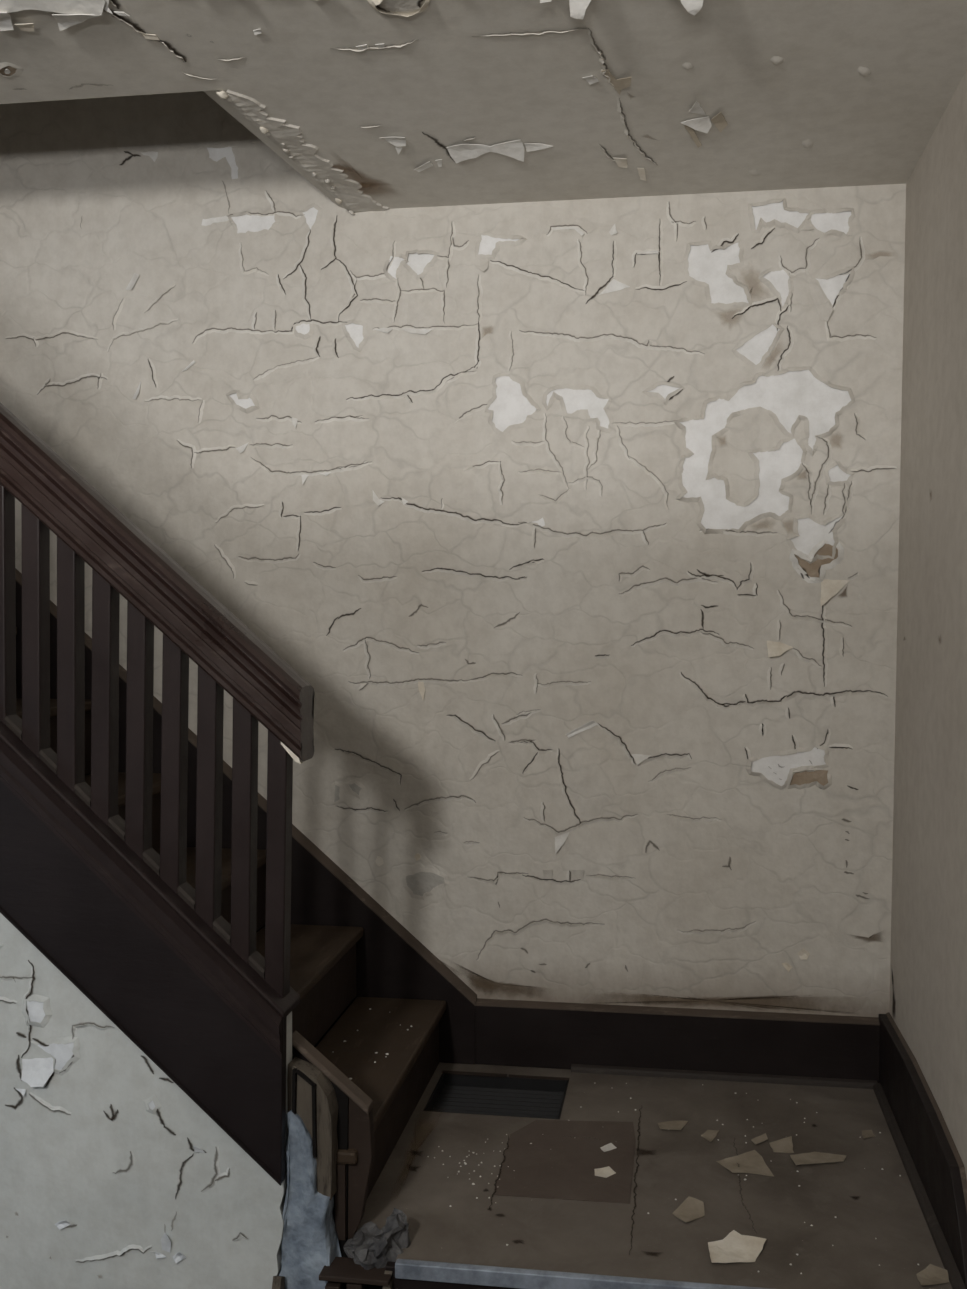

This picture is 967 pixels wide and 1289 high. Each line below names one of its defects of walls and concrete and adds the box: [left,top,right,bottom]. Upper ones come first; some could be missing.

peeling [0,0,129,32]
peeling [569,0,591,19]
spalling [111,90,389,237]
peeling [414,140,553,172]
peeling [674,198,856,606]
crack [5,191,897,759]
crack [334,713,660,851]
crack [467,871,605,973]
peeling [15,994,80,1097]
crack [0,960,115,1115]
crack [104,1104,119,1121]
crack [141,1056,230,1199]